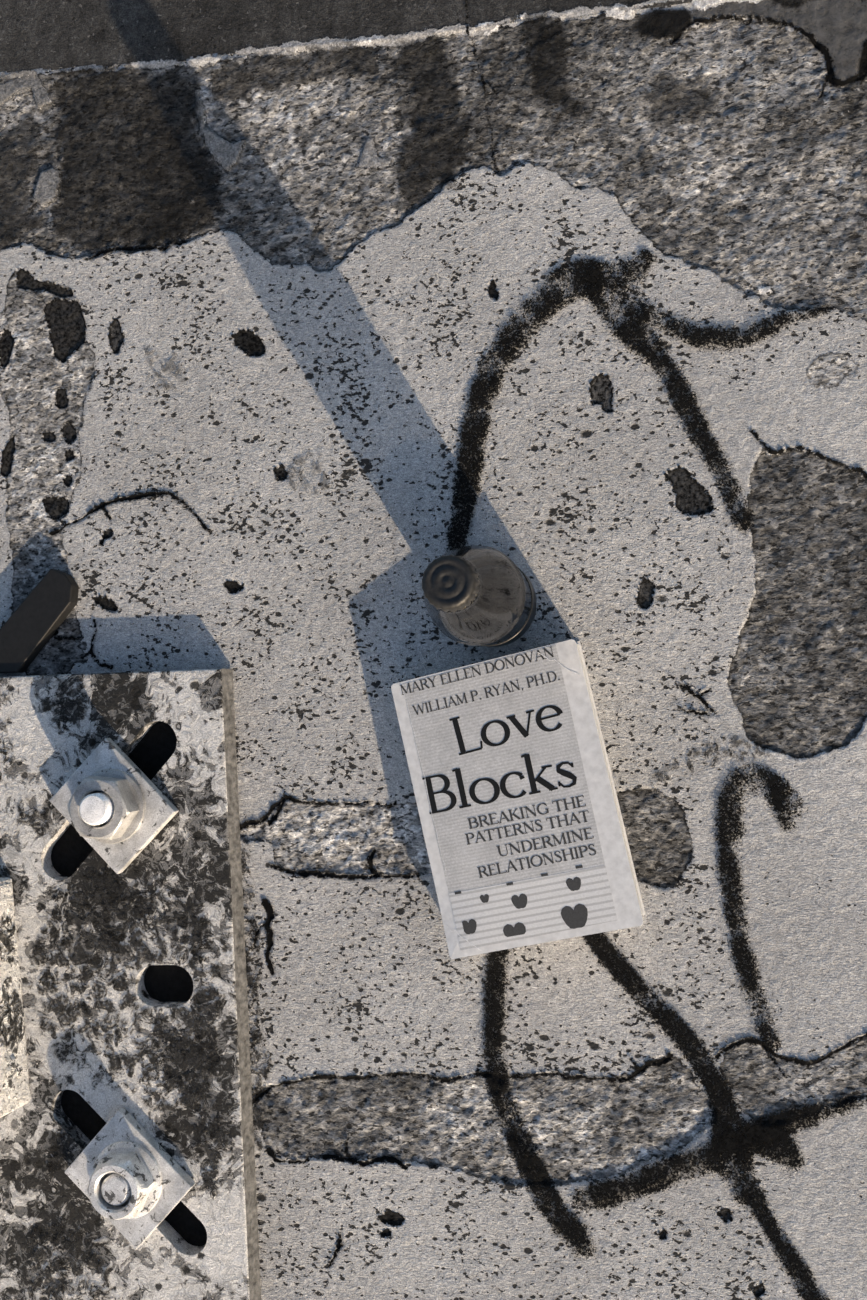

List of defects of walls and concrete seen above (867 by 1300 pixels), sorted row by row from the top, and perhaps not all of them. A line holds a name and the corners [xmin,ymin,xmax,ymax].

spalling [0,0,867,323]
spalling [231,328,266,357]
spalling [589,373,614,413]
spalling [0,268,95,615]
crack [49,491,212,536]
spalling [664,465,714,516]
spalling [727,446,867,761]
crack [240,795,397,830]
spalling [240,800,432,878]
spalling [617,787,694,889]
spalling [252,1056,717,1186]
spalling [719,1037,867,1124]